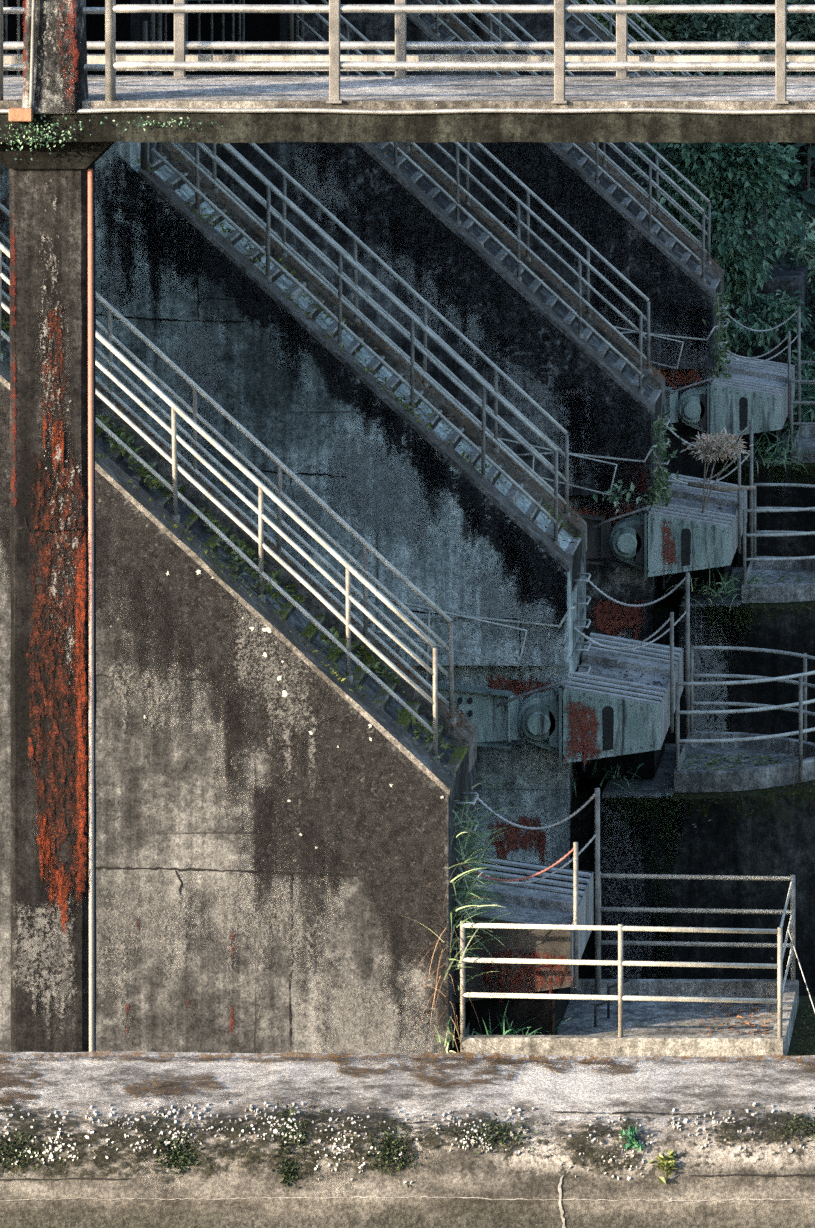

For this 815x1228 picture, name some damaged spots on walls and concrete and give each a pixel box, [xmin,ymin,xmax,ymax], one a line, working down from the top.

rust [57,0,79,102]
rust [0,164,16,326]
leakage [98,161,567,686]
rust [10,307,87,934]
rust [592,599,646,640]
rust [661,519,677,566]
crack [96,866,357,1047]
leakage [95,469,448,1053]
rust [489,816,546,865]
rust [482,950,572,1003]
rust [564,700,601,766]
leakage [603,802,669,979]